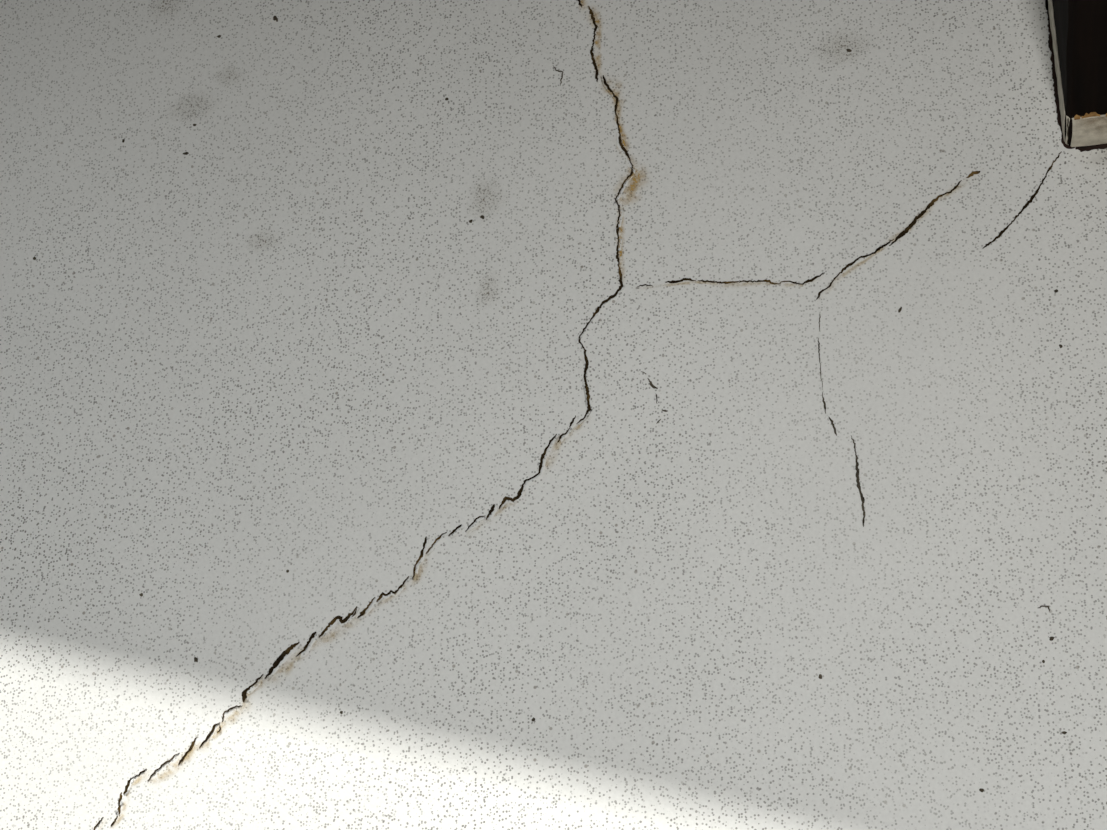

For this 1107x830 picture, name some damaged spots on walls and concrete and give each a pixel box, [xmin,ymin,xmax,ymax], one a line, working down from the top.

crack [982,0,1107,249]
crack [665,171,980,300]
crack [94,0,652,830]
crack [641,371,667,424]
crack [818,316,865,527]